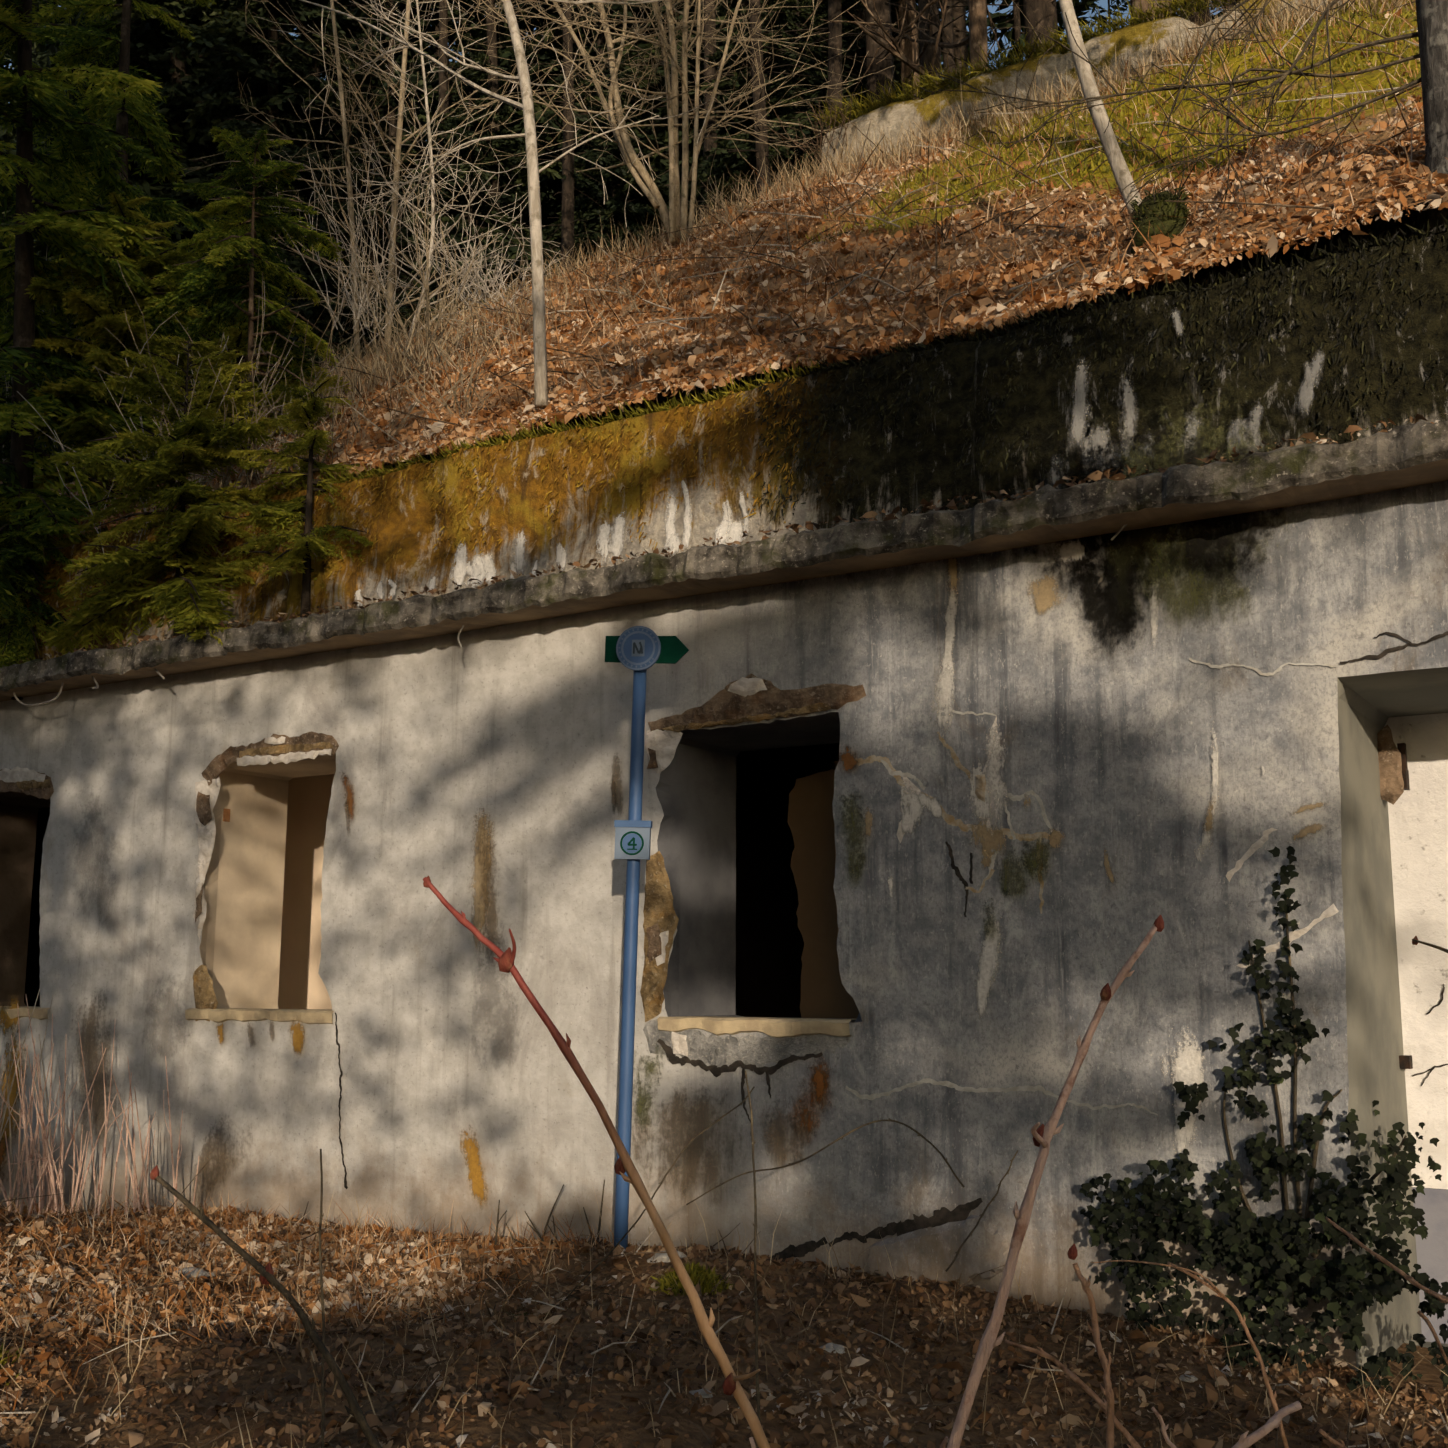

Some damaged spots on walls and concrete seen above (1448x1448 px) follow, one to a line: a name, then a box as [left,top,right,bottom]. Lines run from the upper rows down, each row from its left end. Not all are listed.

damp [1024,360,1295,489]
damp [714,492,749,546]
damp [428,532,538,590]
damp [1025,508,1280,655]
crack [1189,631,1448,676]
spalling [1377,724,1404,805]
spalling [640,851,850,1069]
corrosion [248,1022,274,1045]
corrosion [291,1021,305,1053]
corrosion [0,999,26,1171]
crack [657,1039,823,1123]
crack [772,1198,983,1262]